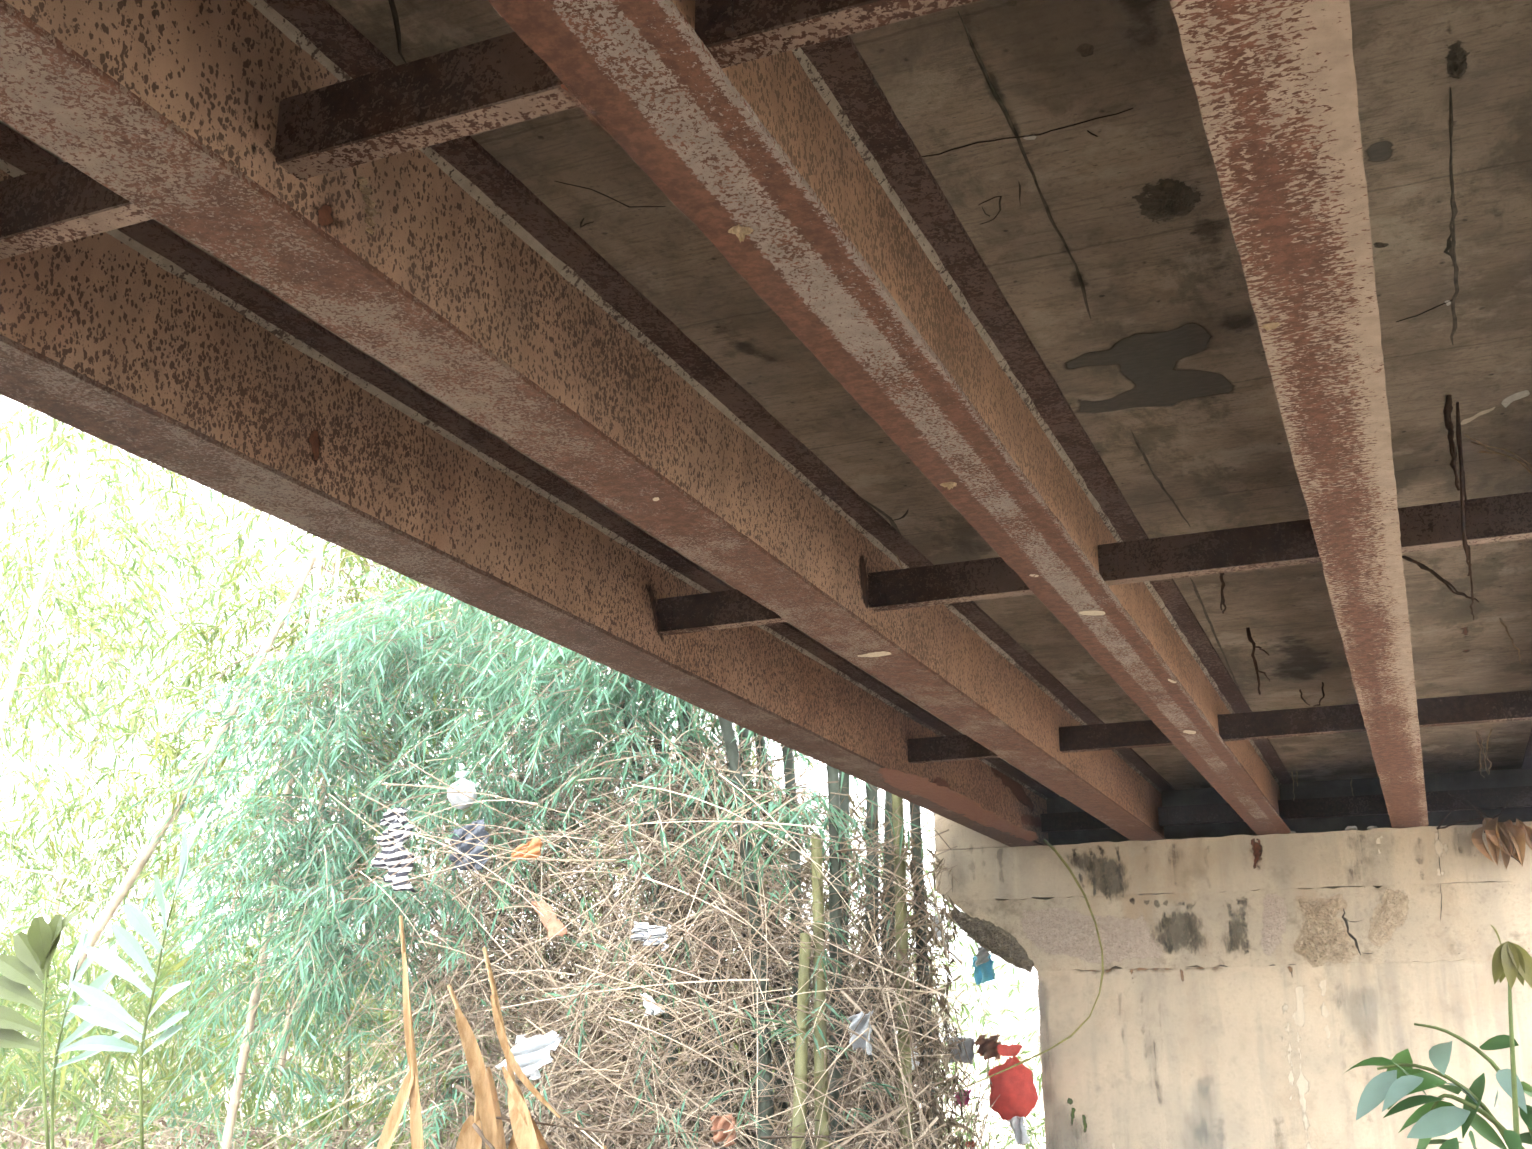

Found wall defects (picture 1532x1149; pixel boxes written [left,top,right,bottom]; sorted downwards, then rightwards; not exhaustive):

crack [921,108,1133,157]
corrosion [313,204,343,227]
crack [1396,88,1459,345]
damp [1065,323,1235,413]
corrosion [859,555,869,608]
damp [1073,847,1121,895]
spalling [1293,889,1409,968]